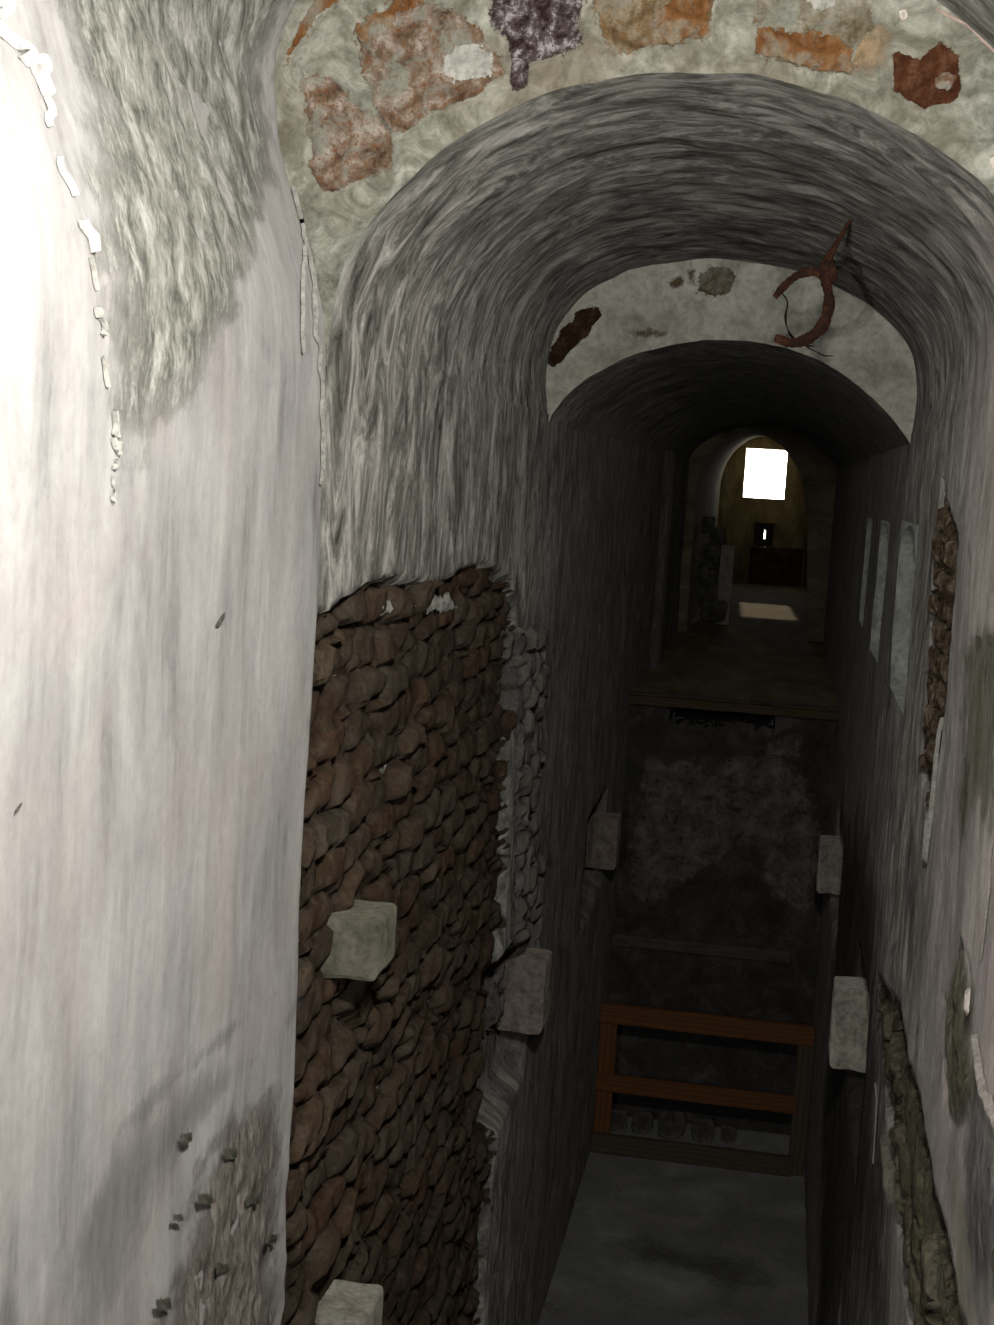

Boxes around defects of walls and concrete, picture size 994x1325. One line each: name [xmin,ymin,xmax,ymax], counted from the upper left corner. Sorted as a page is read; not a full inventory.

peeling [0,0,57,128]
spalling [283,0,717,192]
rust [852,26,961,109]
peeling [57,0,326,505]
spalling [548,306,602,367]
spalling [695,265,736,297]
spalling [918,494,958,864]
spalling [155,566,550,1325]